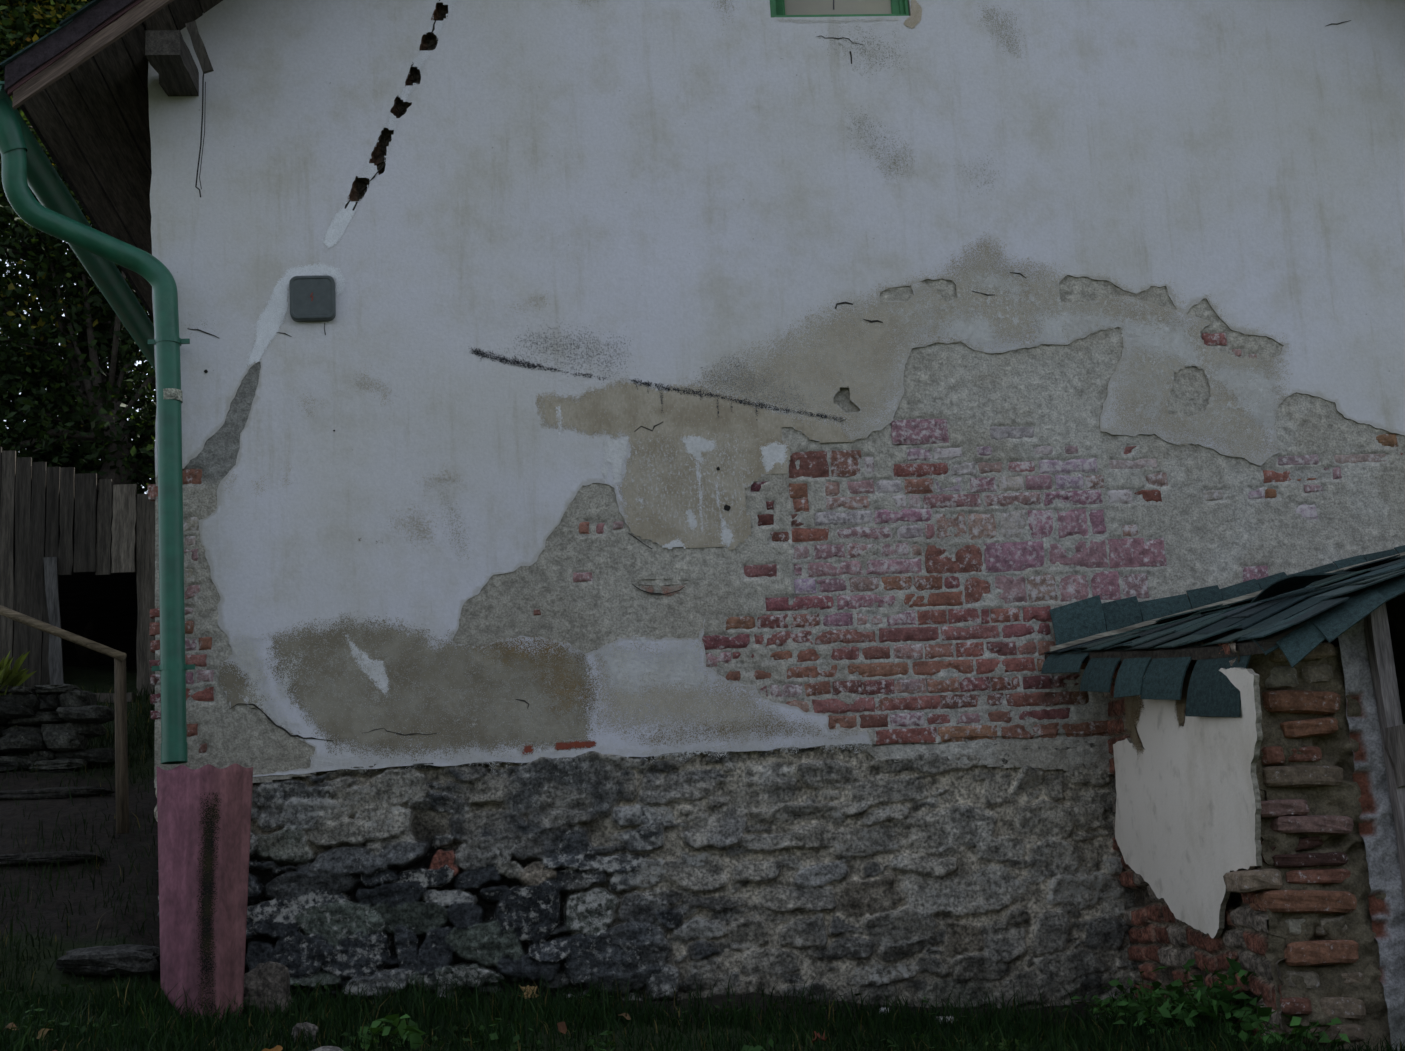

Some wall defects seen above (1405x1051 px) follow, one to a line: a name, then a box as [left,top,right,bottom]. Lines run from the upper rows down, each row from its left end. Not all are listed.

crack [345,162,385,211]
flaking render [879,279,957,305]
flaking render [1059,276,1283,360]
flaking render [147,327,1405,788]